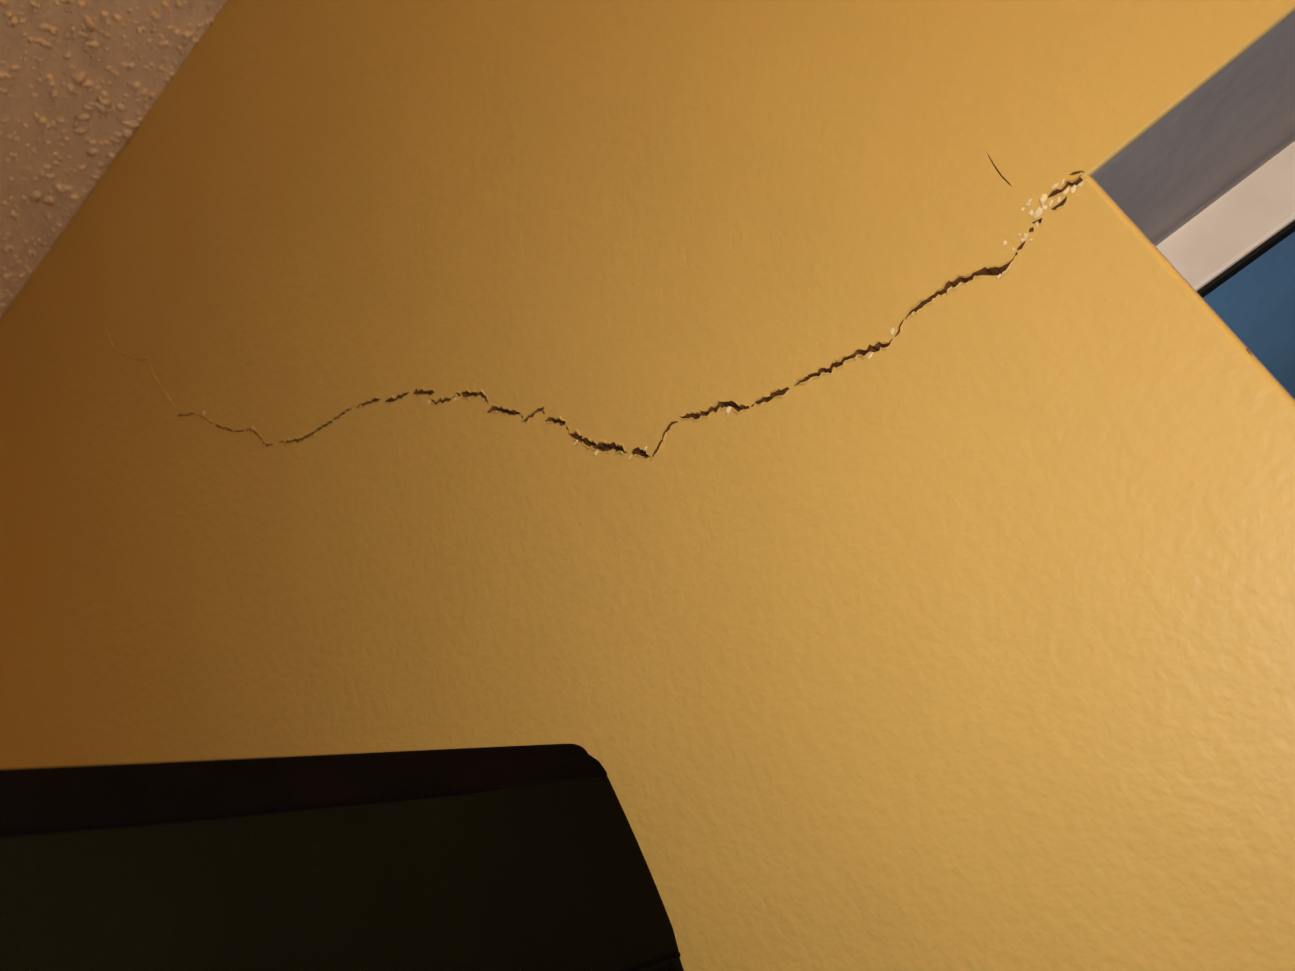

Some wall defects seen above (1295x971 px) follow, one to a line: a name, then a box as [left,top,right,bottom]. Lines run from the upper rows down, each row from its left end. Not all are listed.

crack [107,155,1086,462]